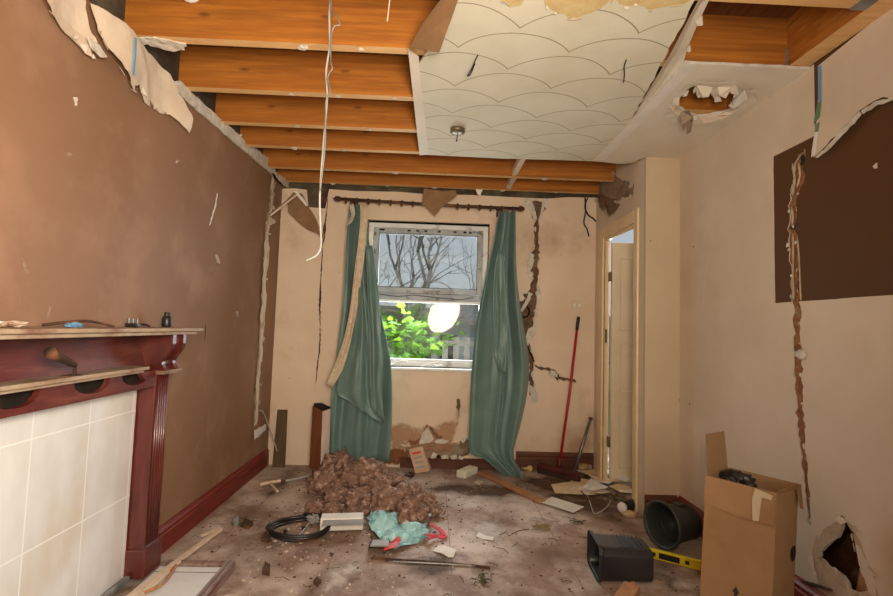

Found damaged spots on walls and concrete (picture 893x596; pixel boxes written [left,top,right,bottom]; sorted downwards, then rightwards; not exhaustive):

peeling [683,85,739,115]
flaking render [595,171,634,214]
crack [316,186,331,380]
crack [520,197,576,403]
crack [786,149,811,523]
flaking render [400,435,471,460]
hole [807,515,879,596]